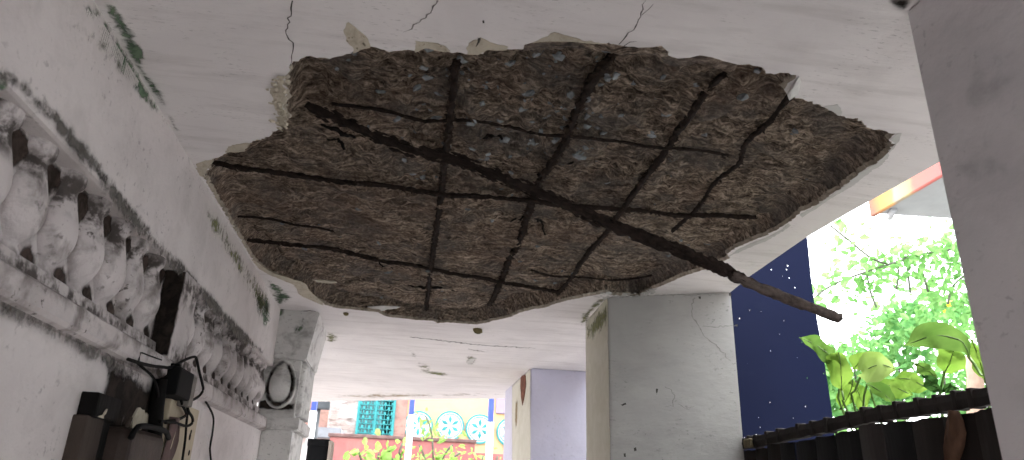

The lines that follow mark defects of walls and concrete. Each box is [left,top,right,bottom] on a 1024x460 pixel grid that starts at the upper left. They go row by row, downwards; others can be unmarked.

crack [285,1,294,65]
crack [405,0,438,32]
crack [619,0,652,46]
spalling [196,22,901,325]